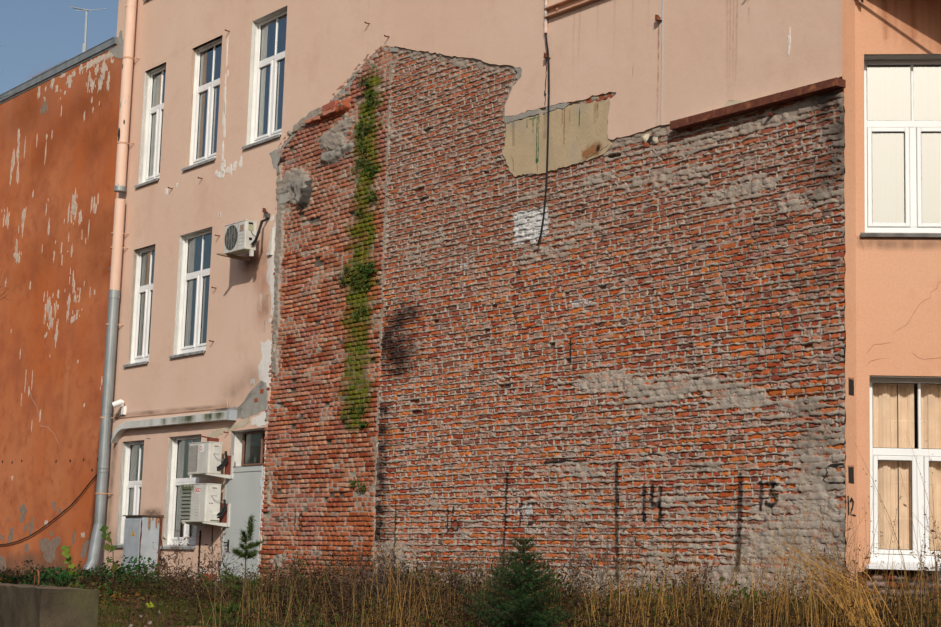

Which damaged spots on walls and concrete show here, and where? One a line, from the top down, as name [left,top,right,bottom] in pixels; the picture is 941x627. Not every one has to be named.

peeling [37,30,124,120]
peeling [215,40,242,179]
spalling [304,98,353,126]
peeling [1,189,34,263]
peeling [9,129,53,186]
spalling [279,177,313,209]
peeling [42,188,99,358]
spalling [207,216,276,438]
crack [865,282,939,366]